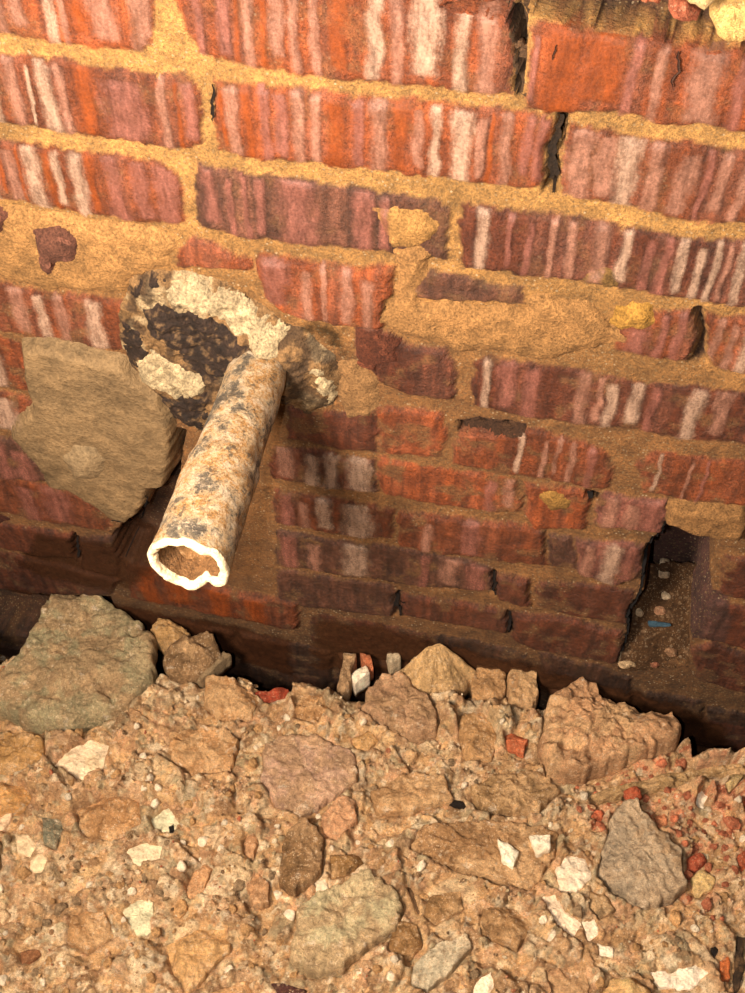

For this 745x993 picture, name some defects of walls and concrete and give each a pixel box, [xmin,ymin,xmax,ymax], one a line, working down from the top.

crack [670,51,681,87]
crack [547,112,565,193]